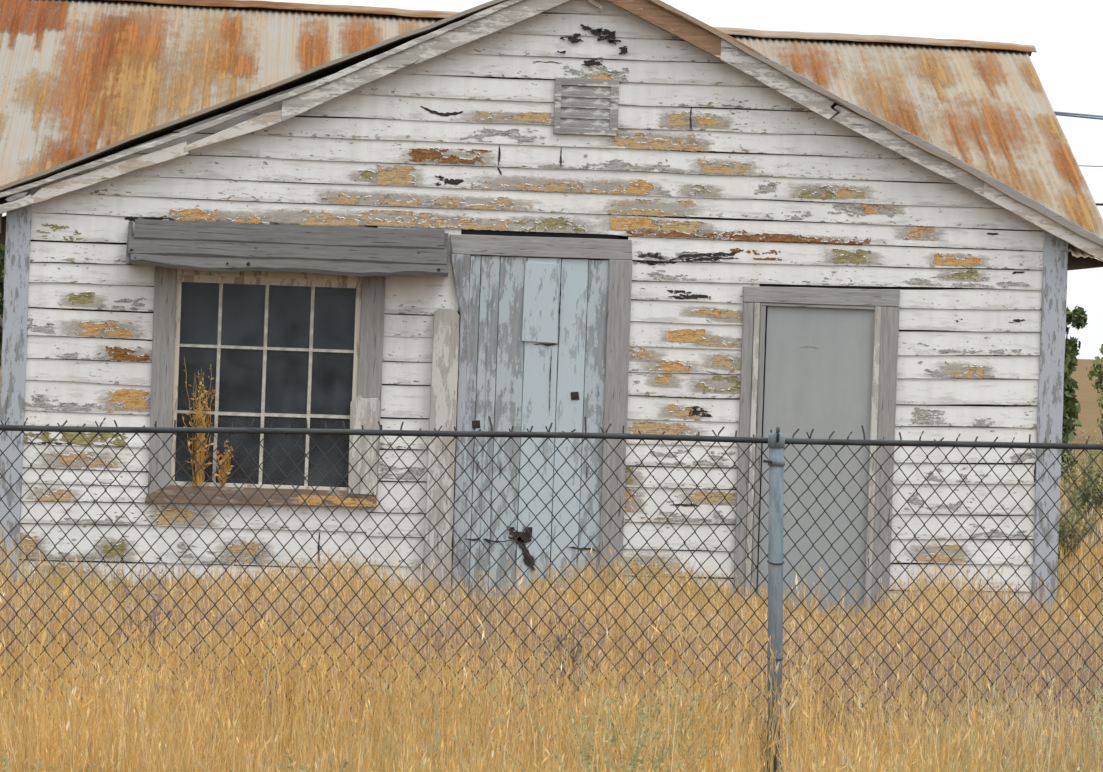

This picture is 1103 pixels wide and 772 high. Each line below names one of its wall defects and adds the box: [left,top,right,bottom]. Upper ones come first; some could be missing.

rust [0,0,255,177]
rust [299,19,329,70]
rust [341,19,378,55]
peeling [557,24,629,84]
rust [780,41,839,88]
rust [857,62,925,137]
rust [912,50,1101,232]
peeling [169,110,879,265]
peeling [766,184,903,220]
peeling [28,291,152,362]
peeling [629,251,743,394]
peeling [627,403,712,435]